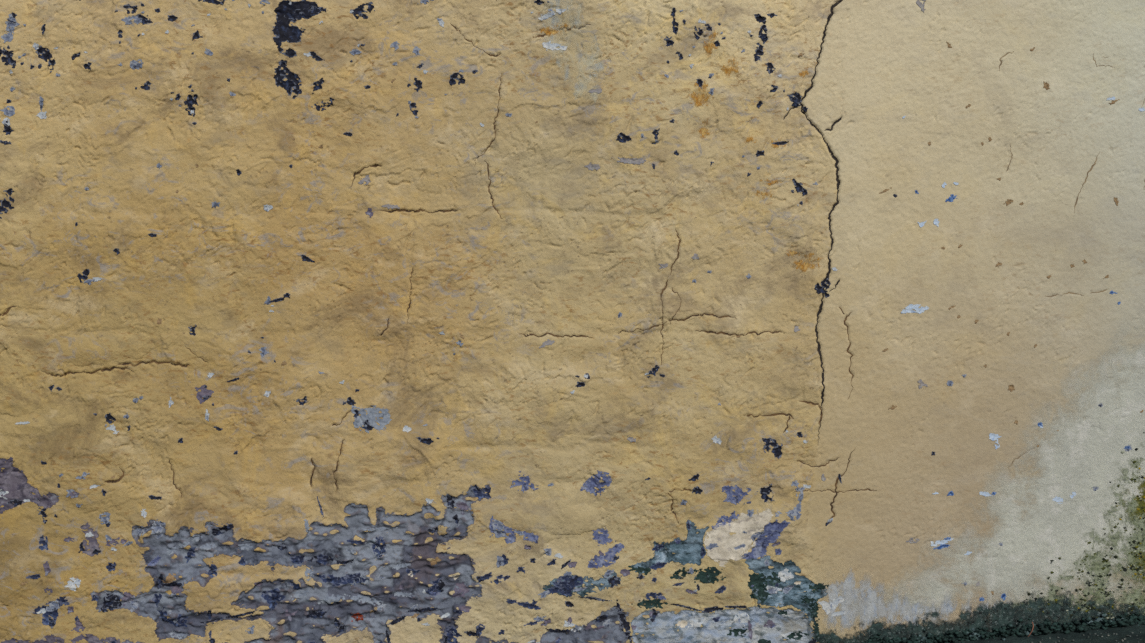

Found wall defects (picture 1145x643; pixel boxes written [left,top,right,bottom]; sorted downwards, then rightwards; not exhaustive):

peeling [117,59,144,70]
peeling [191,24,213,56]
peeling [248,0,334,111]
peeling [170,84,198,125]
crack [747,0,877,518]
crack [380,268,413,336]
crack [521,331,592,339]
crack [620,231,781,365]
crack [668,489,691,524]
leakage [813,347,1145,643]
peeling [0,457,846,643]
peeling [906,537,954,549]